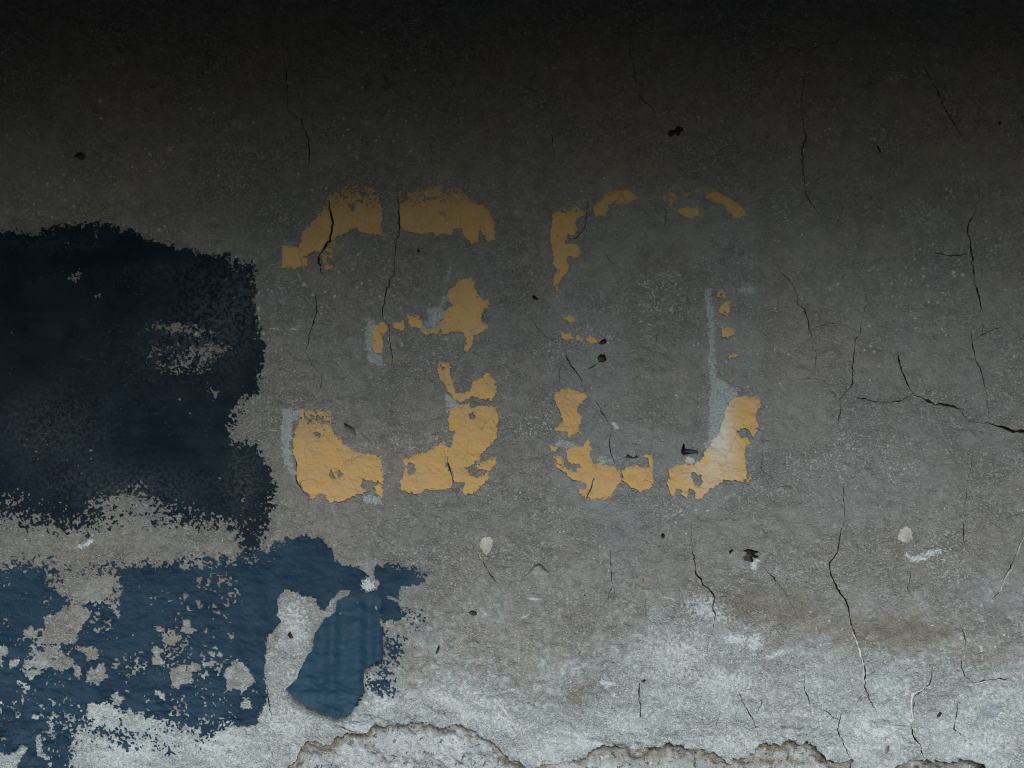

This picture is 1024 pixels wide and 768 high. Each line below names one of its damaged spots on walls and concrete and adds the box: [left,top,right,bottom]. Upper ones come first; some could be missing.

peeling [0,220,427,768]
crack [305,202,334,392]
crack [382,198,401,372]
peeling [372,278,490,367]
peeling [400,362,499,495]
crack [531,319,625,463]
peeling [550,388,761,500]
crack [777,191,1024,433]
crack [691,532,731,653]
crack [804,482,1011,757]
spalling [288,722,854,768]
spalling [895,758,986,768]